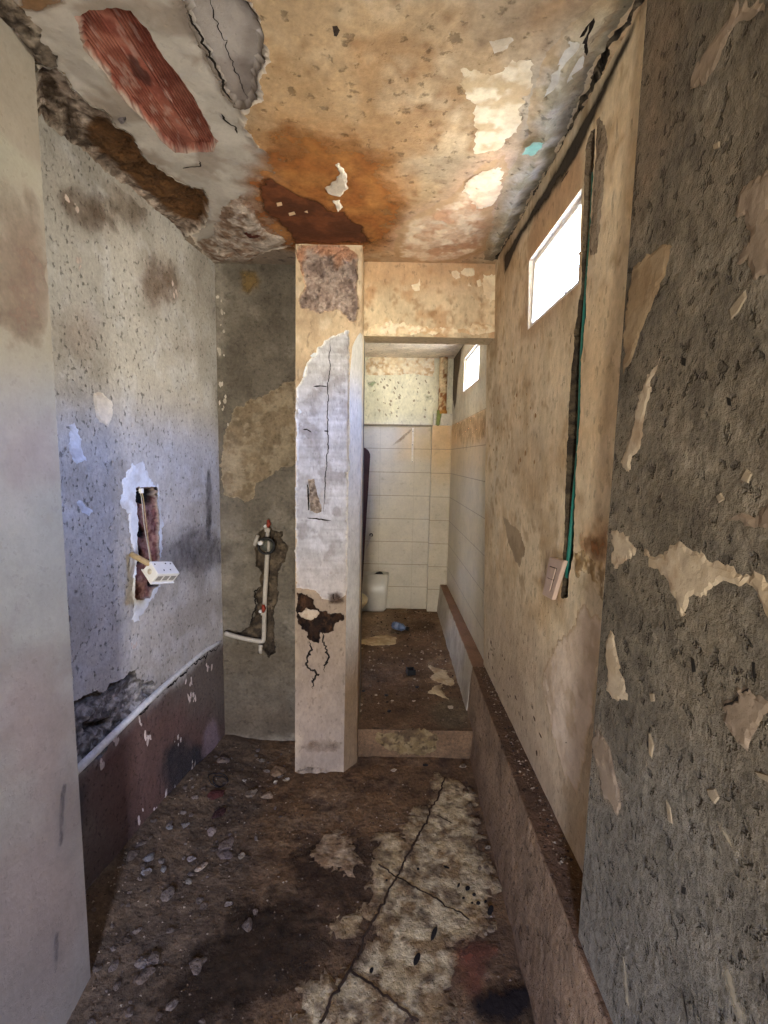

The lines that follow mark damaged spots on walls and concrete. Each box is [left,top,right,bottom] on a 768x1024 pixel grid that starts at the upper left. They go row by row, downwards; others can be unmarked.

peeling [545,41,584,96]
peeling [394,37,533,303]
peeling [522,142,543,156]
corrosion [259,178,369,244]
flaking render [0,0,360,689]
spalling [74,670,155,770]
spalling [457,883,494,915]